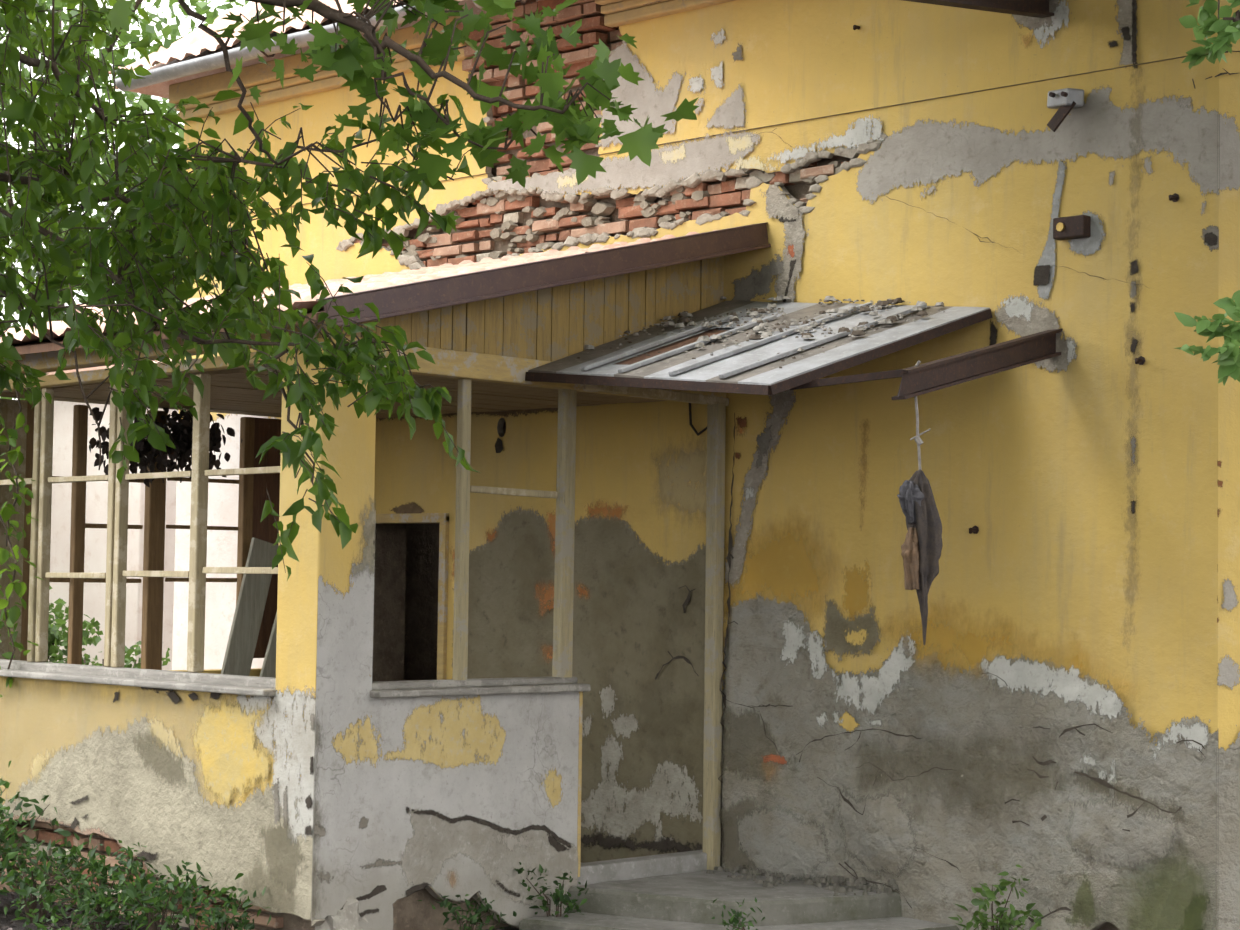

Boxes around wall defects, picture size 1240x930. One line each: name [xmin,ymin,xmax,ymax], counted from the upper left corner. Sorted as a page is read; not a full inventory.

flaking render [336,233,364,251]
peeling [381,0,1240,270]
peeling [172,456,192,670]
peeling [204,413,277,670]
peeling [1221,578,1238,611]
peeling [0,502,706,930]
peeling [720,592,1240,930]
crack [1005,723,1182,832]
crack [839,862,912,909]